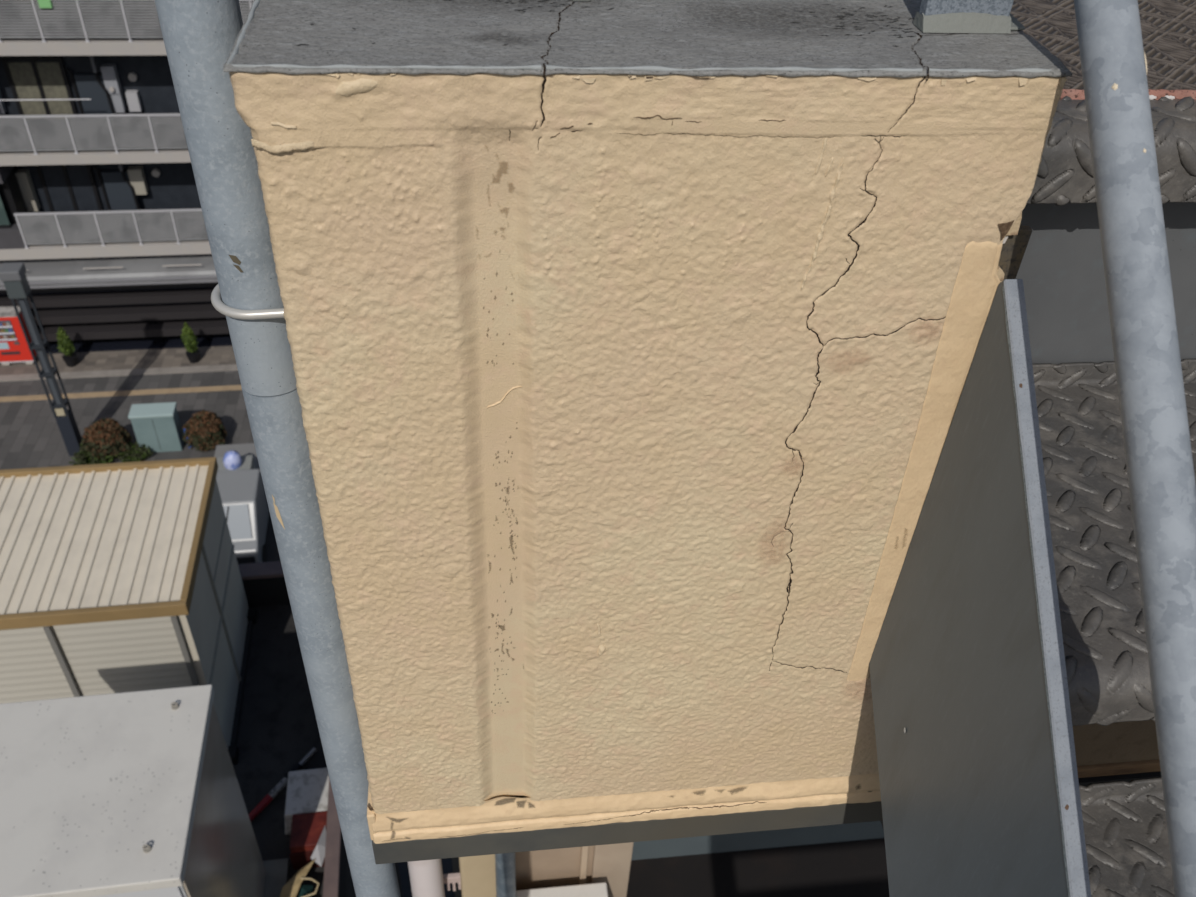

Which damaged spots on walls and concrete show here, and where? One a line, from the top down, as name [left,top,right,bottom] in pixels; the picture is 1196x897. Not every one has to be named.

crack [509,2,968,673]